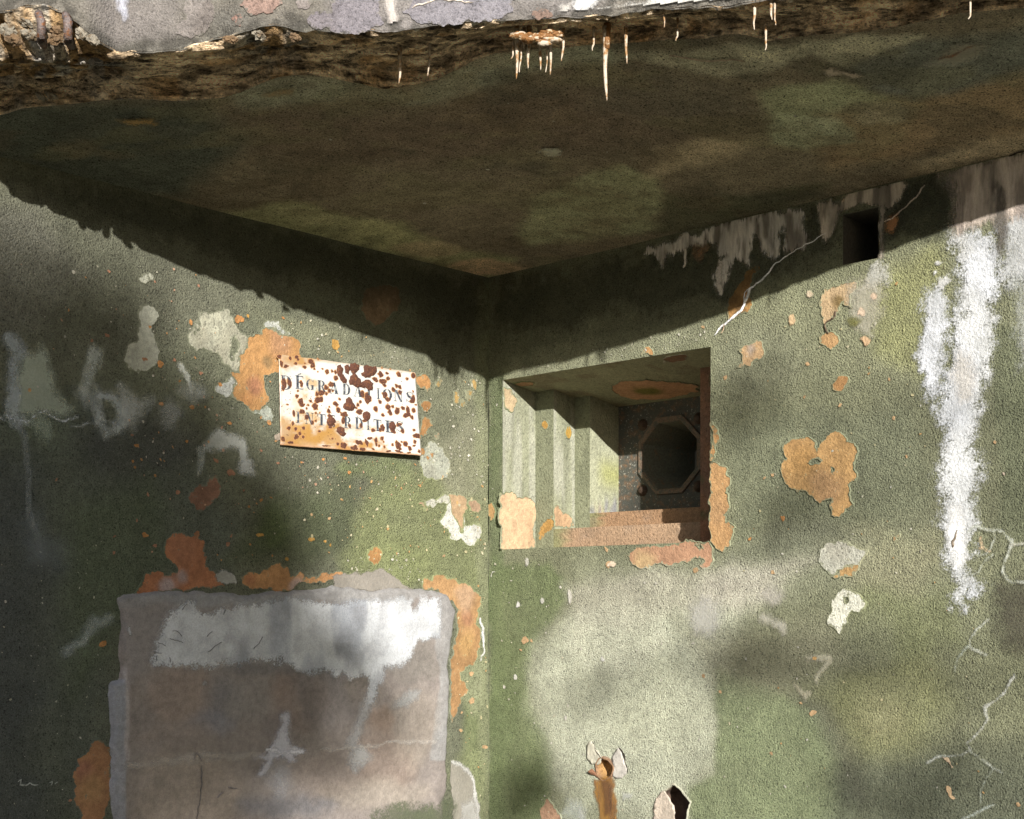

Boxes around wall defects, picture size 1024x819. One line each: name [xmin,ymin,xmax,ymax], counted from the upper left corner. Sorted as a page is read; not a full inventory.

spalling [0,0,1024,115]
water stain [508,28,564,46]
water stain [646,208,809,295]
crack [715,233,825,335]
crack [884,185,925,222]
peeling [187,308,302,440]
water stain [817,154,1024,613]
peeling [417,491,574,553]
peeling [627,420,736,573]
crack [951,525,1024,583]
water stain [150,596,441,776]
rust [594,777,617,819]